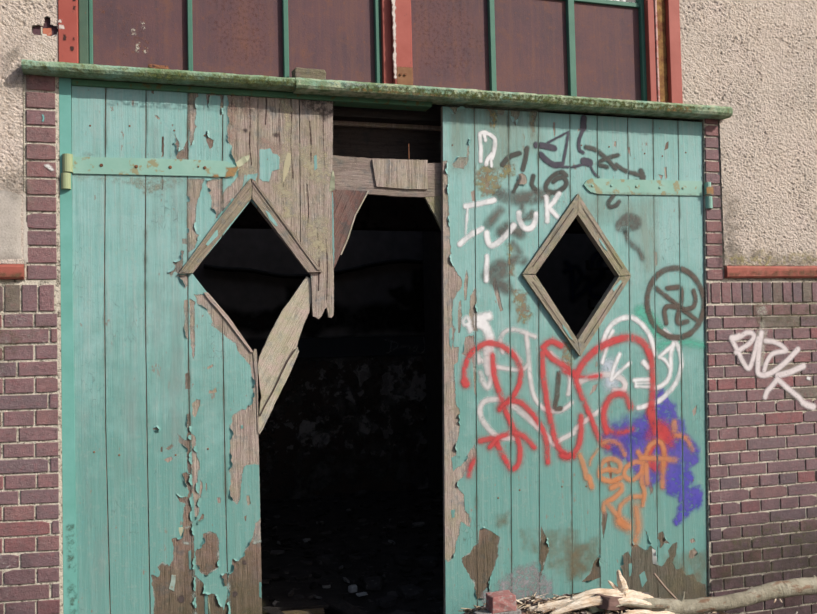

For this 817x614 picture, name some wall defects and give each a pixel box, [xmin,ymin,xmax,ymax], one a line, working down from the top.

spalling [32,17,75,51]
peeling [161,93,425,337]
spalling [182,287,428,505]
peeling [443,156,500,601]
peeling [151,399,261,614]
peeling [538,527,549,576]
peeling [582,554,601,583]
peeling [620,531,707,600]